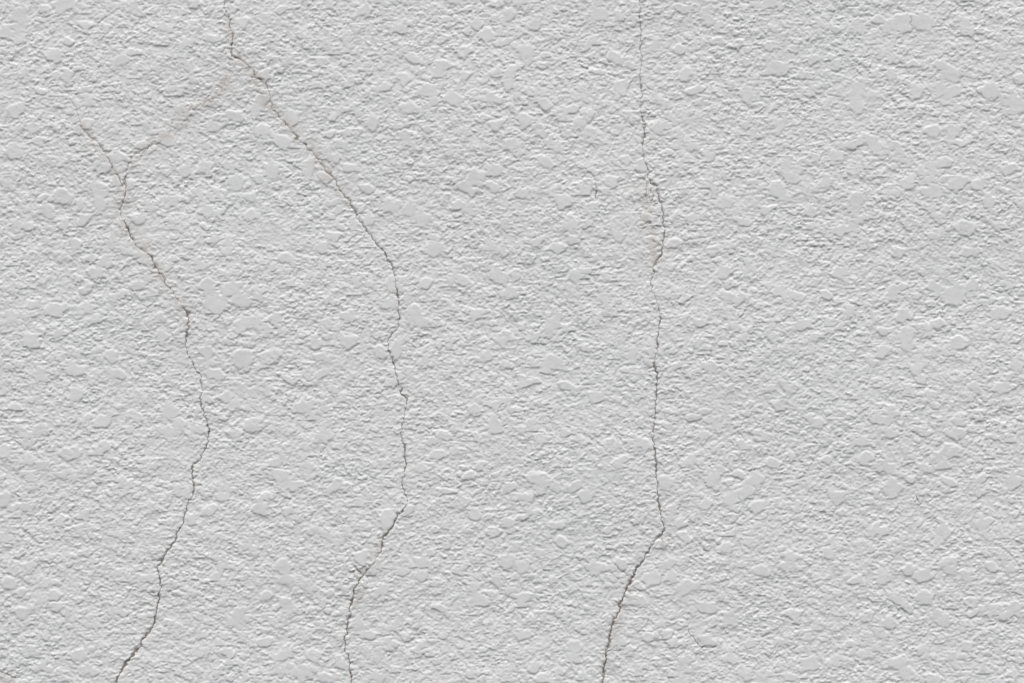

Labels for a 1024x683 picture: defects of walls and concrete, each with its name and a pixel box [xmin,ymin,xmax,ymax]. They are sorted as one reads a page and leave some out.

crack [116,149,210,681]
crack [343,210,407,683]
crack [601,214,671,683]